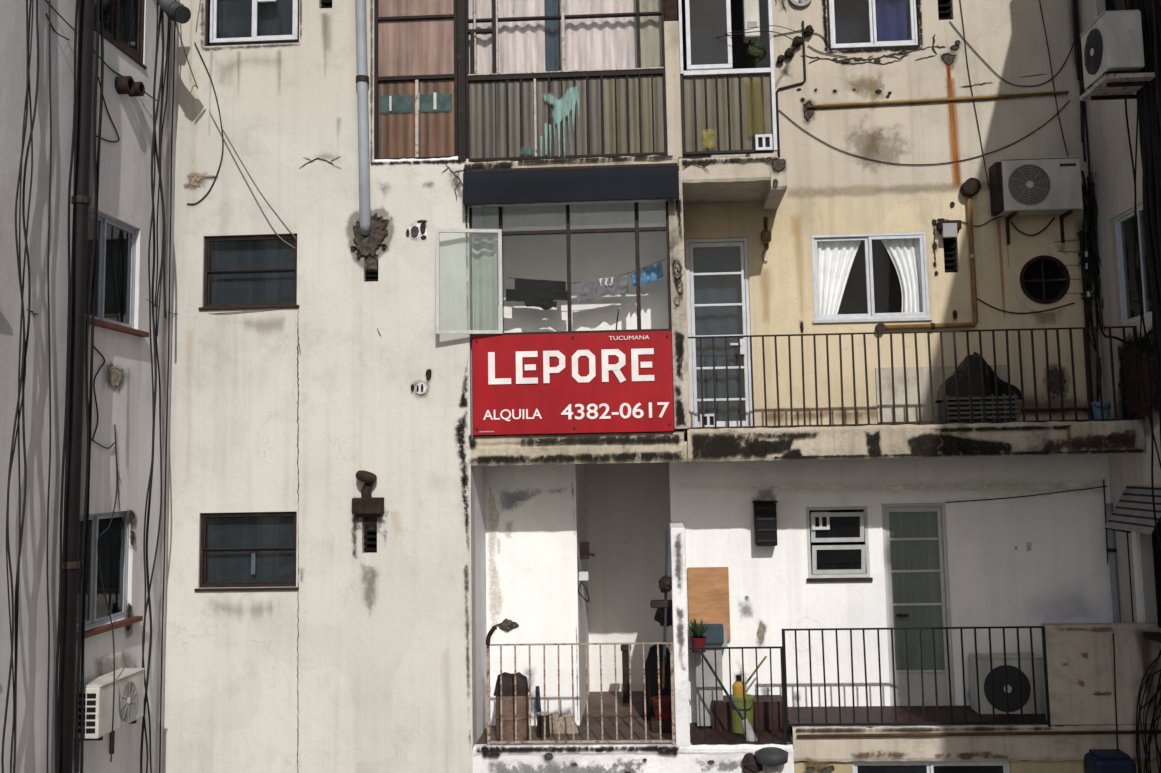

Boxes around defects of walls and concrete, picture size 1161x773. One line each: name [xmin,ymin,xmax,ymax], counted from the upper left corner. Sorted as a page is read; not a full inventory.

damp [850,80,881,95]
crack [300,156,341,168]
spalling [349,209,428,268]